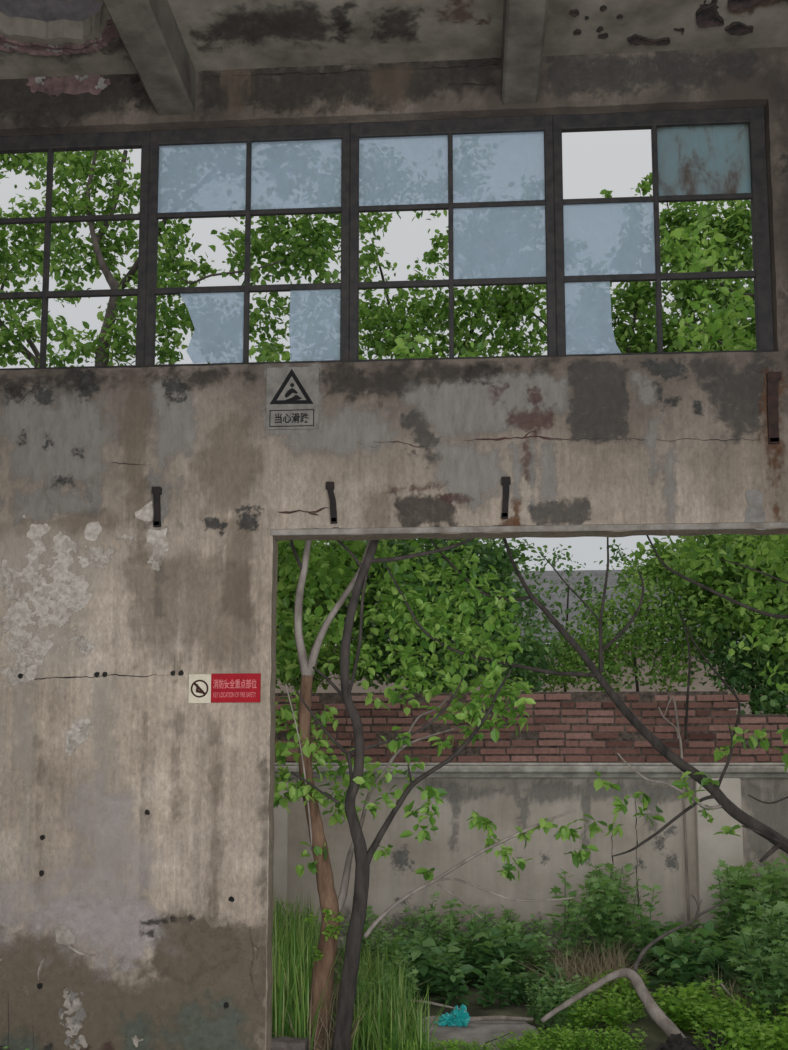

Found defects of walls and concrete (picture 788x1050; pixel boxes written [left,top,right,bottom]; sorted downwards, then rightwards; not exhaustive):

leakage [191,1,356,49]
leakage [373,8,422,43]
peeling [569,5,623,39]
peeling [627,28,684,46]
peeling [696,0,766,36]
flaking render [26,75,111,99]
leakage [283,359,687,527]
peeling [135,501,154,522]
peeling [0,514,134,687]
crack [35,673,160,681]
leakage [0,895,266,1050]
flaking render [58,988,88,1050]